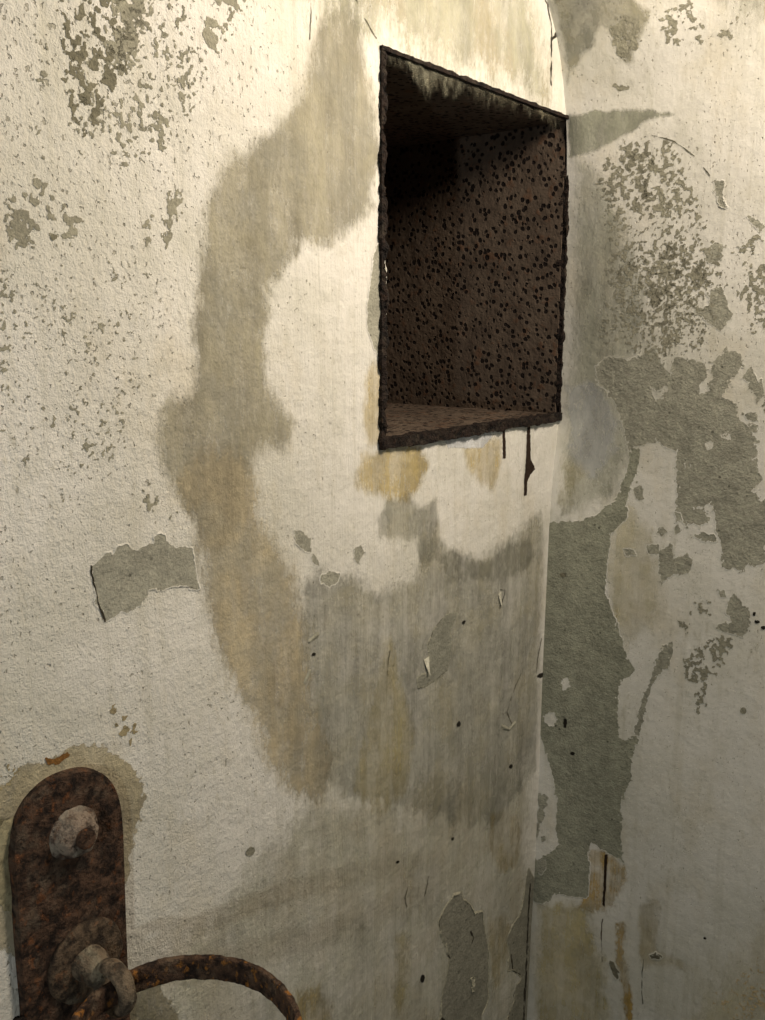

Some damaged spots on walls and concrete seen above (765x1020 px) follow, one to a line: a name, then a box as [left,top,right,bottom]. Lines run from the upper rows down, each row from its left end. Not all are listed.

peeling [56,0,248,179]
crack [545,0,557,86]
damp [556,0,649,68]
damp [163,0,549,533]
peeling [140,482,159,512]
peeling [90,531,201,623]
peeling [506,136,765,1020]
damp [301,499,541,825]
rust [130,985,178,1020]
spalling [438,891,489,1020]